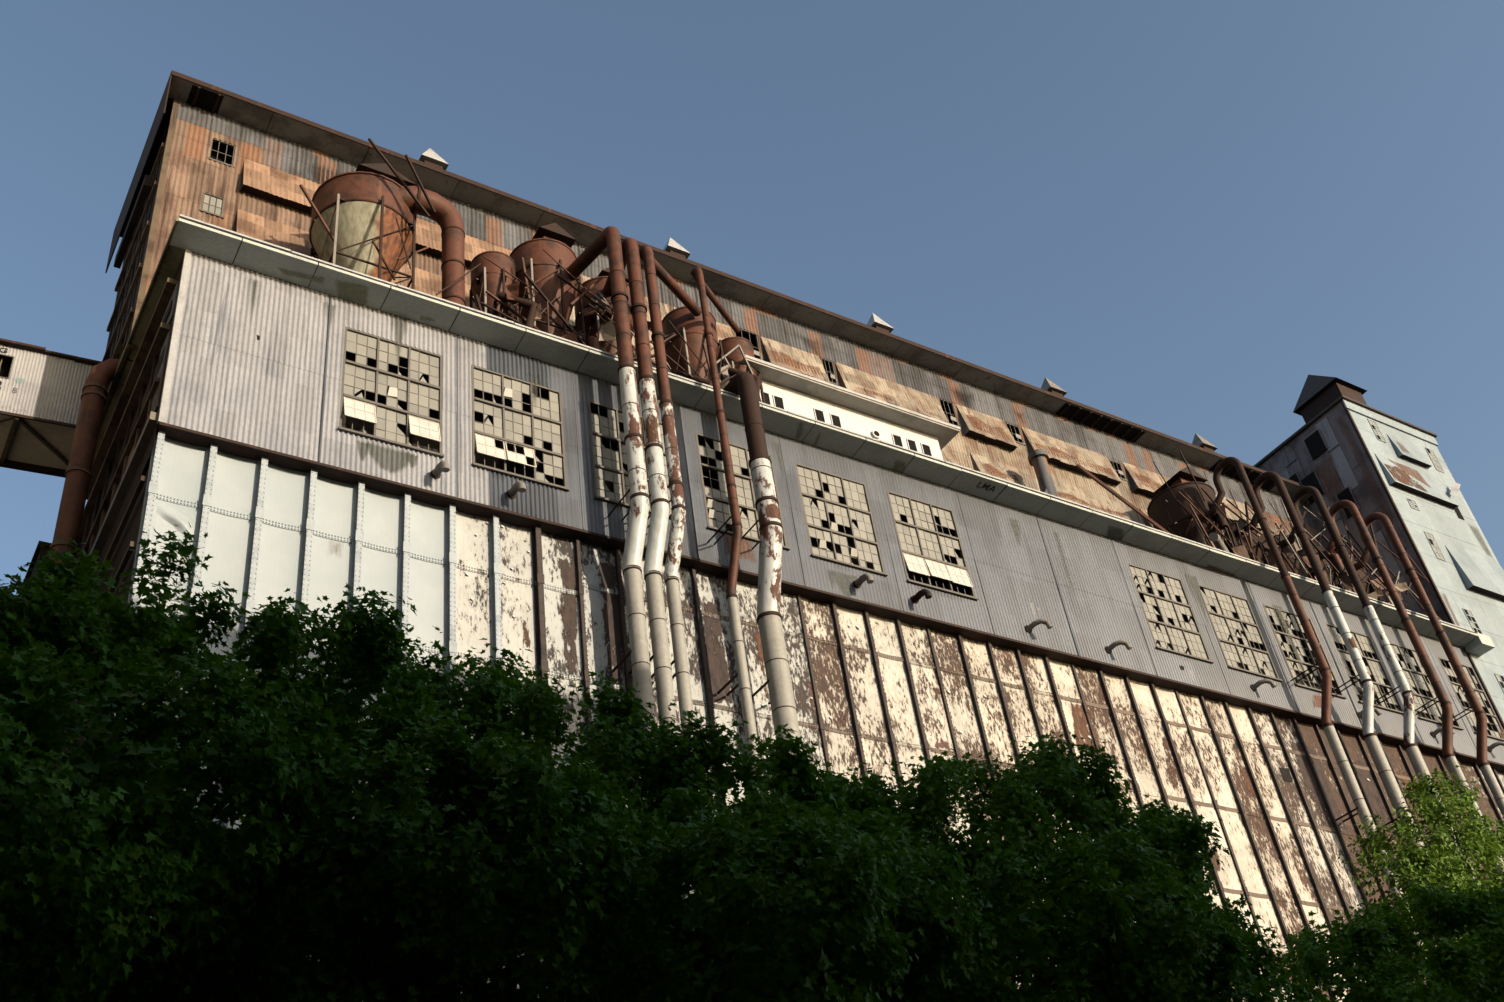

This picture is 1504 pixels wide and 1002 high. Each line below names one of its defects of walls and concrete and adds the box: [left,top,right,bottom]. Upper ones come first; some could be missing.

corrosion [772,351,821,374]
corrosion [967,415,1005,438]
corrosion [983,464,1018,482]
corrosion [1136,474,1162,490]
corrosion [1338,418,1430,520]
peeling [513,615,531,648]
peeling [557,556,624,692]
peeling [702,597,733,704]
peeling [807,682,853,737]
peeling [1071,703,1119,763]
peeling [1159,733,1186,789]
peeling [1287,741,1347,834]